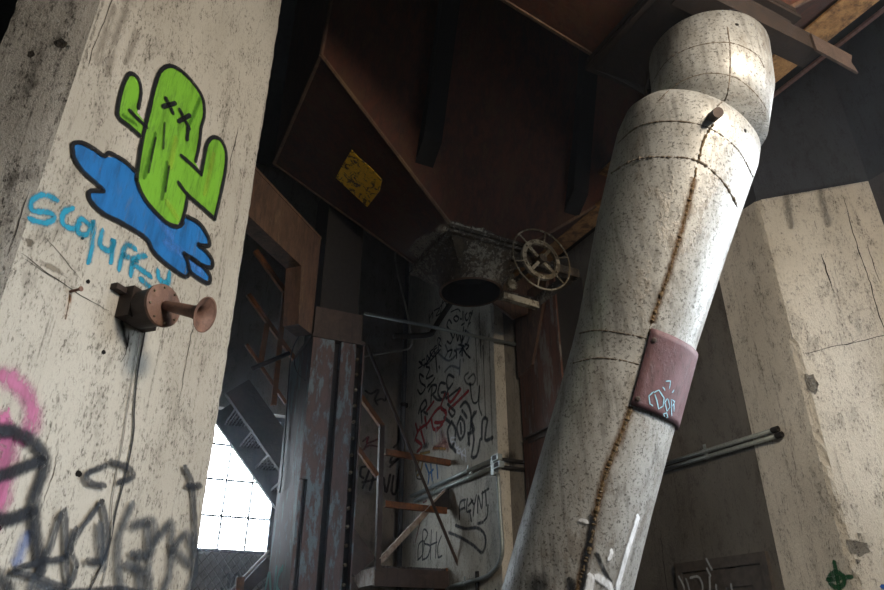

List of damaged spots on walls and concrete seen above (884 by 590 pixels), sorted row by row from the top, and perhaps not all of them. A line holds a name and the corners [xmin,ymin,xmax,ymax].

corrosion [648,177,697,323]
crack [805,197,884,354]
spalling [804,374,819,395]
corrosion [593,406,634,527]
spalling [846,533,871,564]